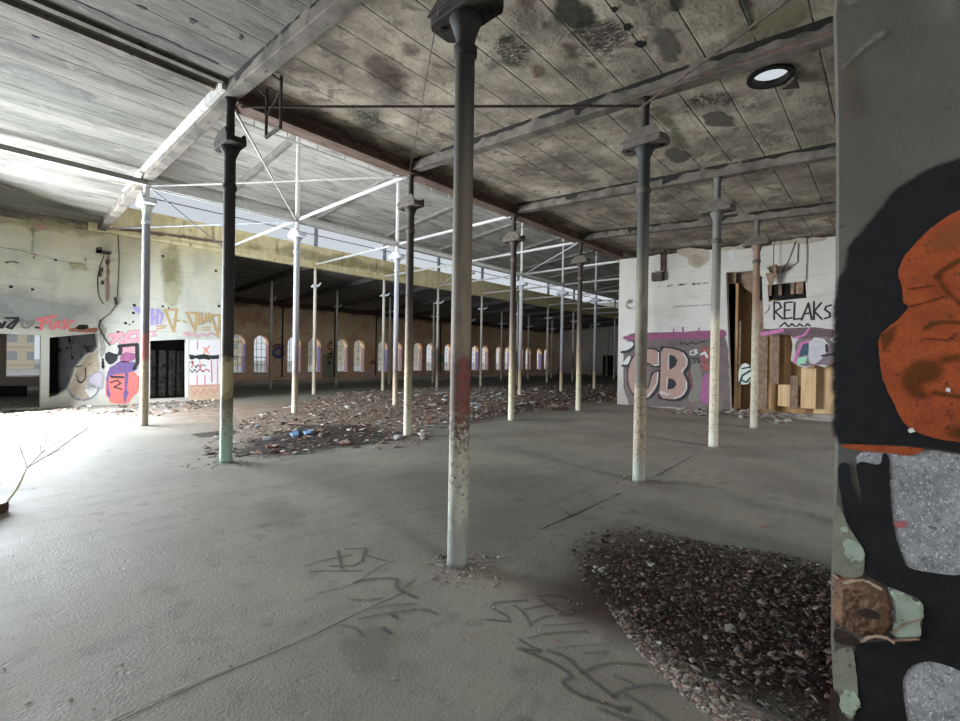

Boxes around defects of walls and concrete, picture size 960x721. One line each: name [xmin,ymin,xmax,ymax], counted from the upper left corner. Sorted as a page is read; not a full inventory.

water stain [497,35,528,65]
water stain [572,21,627,53]
water stain [689,92,734,127]